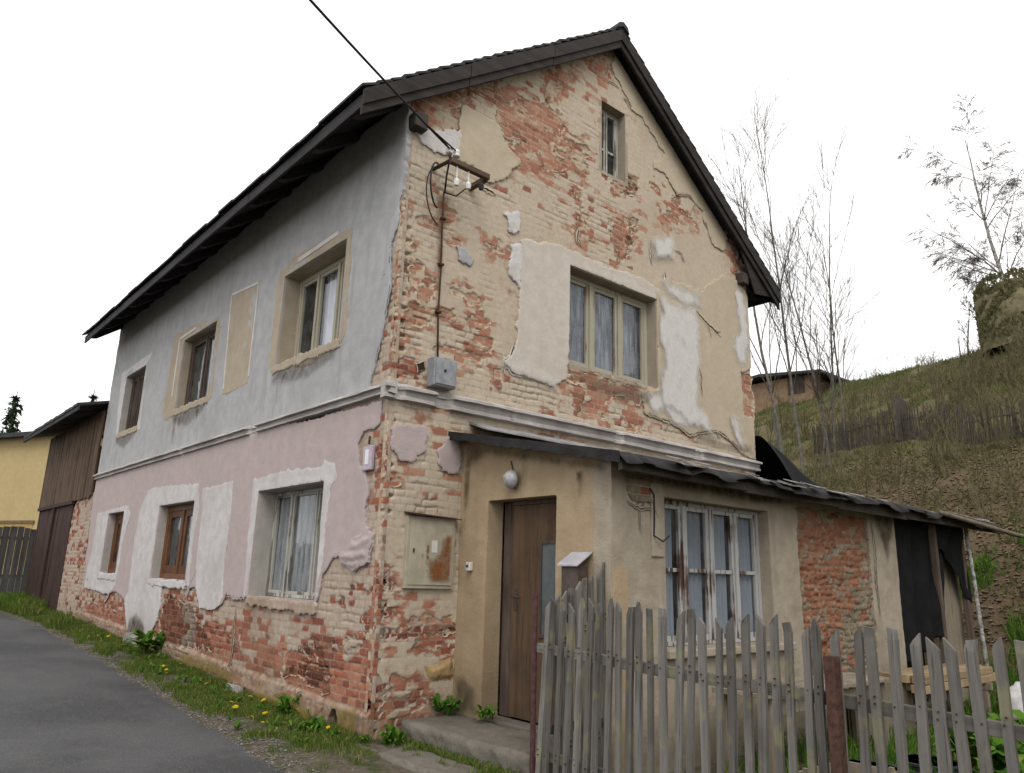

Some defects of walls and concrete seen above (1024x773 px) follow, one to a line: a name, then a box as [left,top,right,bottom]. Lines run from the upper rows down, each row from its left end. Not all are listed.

spalling [412,72,659,235]
spalling [391,201,504,383]
peeling [484,211,523,288]
crack [649,240,685,279]
crack [672,186,712,243]
crack [694,308,721,337]
peeling [372,423,462,493]
spalling [567,370,642,419]
crack [642,395,756,460]
corrosion [427,537,451,581]
spalling [158,592,233,672]
spalling [280,563,456,739]